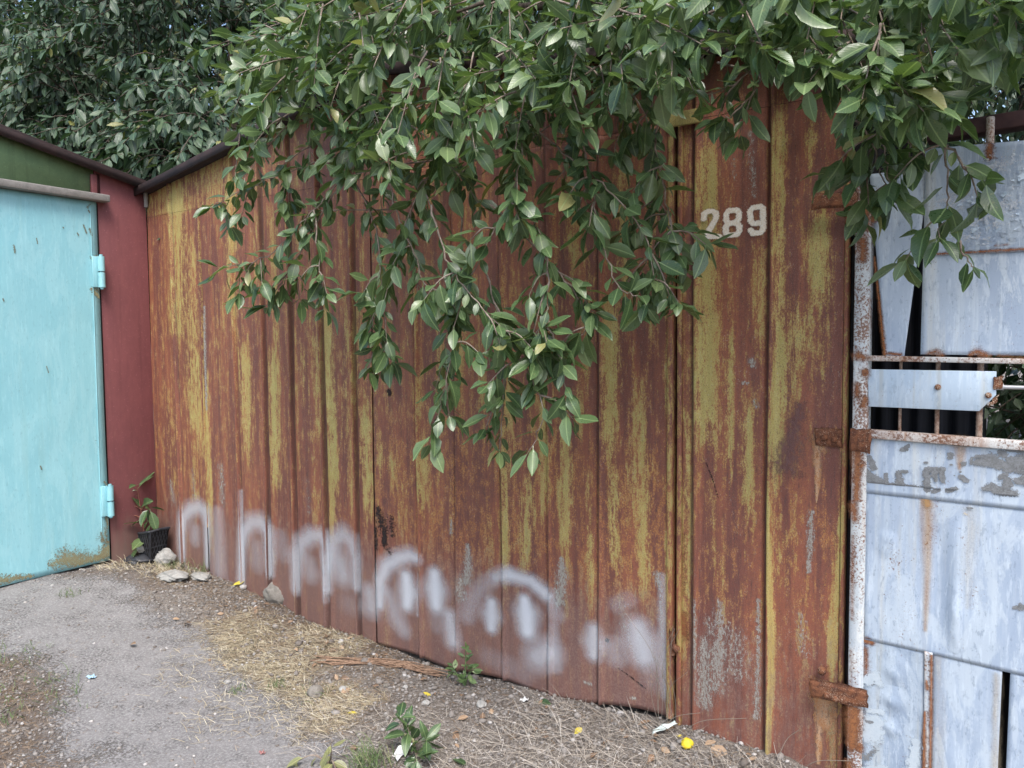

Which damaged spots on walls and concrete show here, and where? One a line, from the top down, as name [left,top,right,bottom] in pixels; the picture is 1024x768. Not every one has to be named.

rust [852,350,871,410]
rust [810,432,867,522]
peeling [866,449,1024,497]
peeling [47,516,110,571]
peeling [0,573,34,586]
peeling [692,598,763,720]
rust [850,637,875,676]
rust [811,698,864,768]